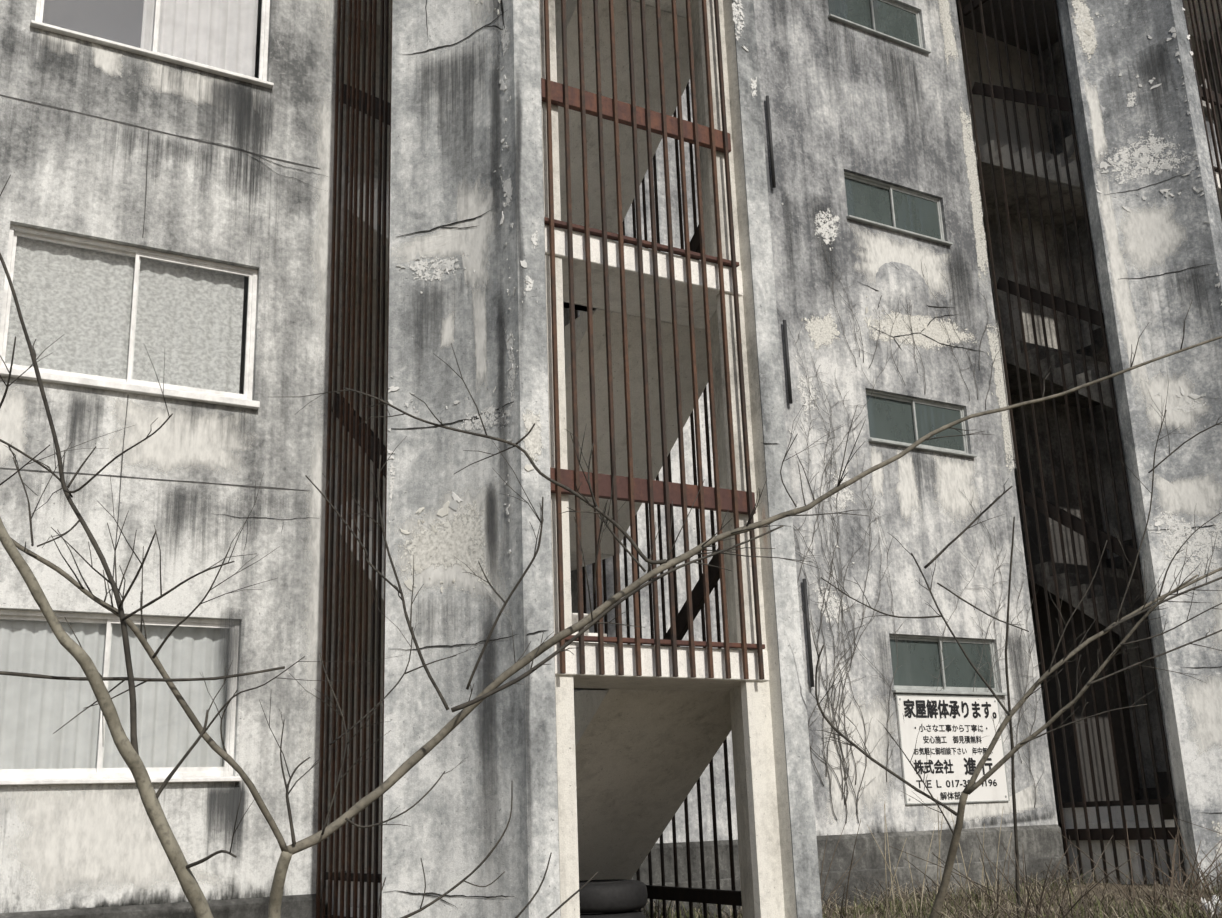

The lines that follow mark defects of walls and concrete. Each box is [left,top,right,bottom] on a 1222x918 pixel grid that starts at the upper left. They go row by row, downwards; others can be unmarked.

damp [40,31,123,75]
damp [149,62,273,174]
crack [403,0,507,55]
peeling [473,0,511,102]
damp [882,51,918,97]
peeling [1096,27,1204,212]
crack [397,210,491,237]
peeling [494,118,514,228]
peeling [814,208,844,251]
damp [399,489,501,608]
damp [481,622,495,767]